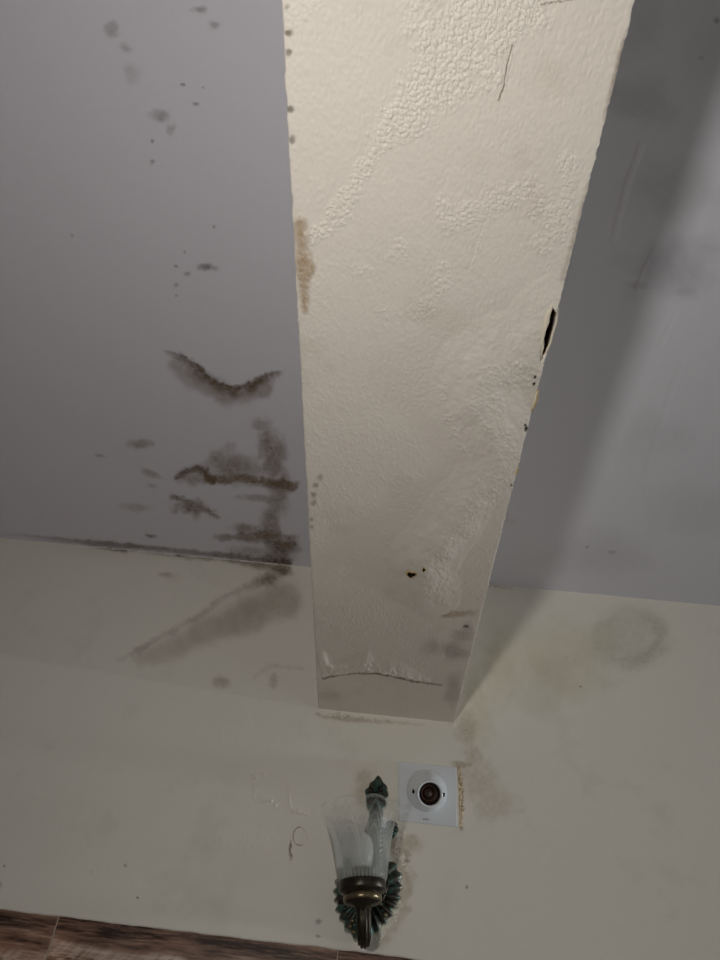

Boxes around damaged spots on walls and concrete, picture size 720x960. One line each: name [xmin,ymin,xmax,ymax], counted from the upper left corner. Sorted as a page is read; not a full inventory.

spalling [540,303,559,361]
water stain [181,355,272,393]
water stain [181,465,297,490]
water stain [457,763,465,828]